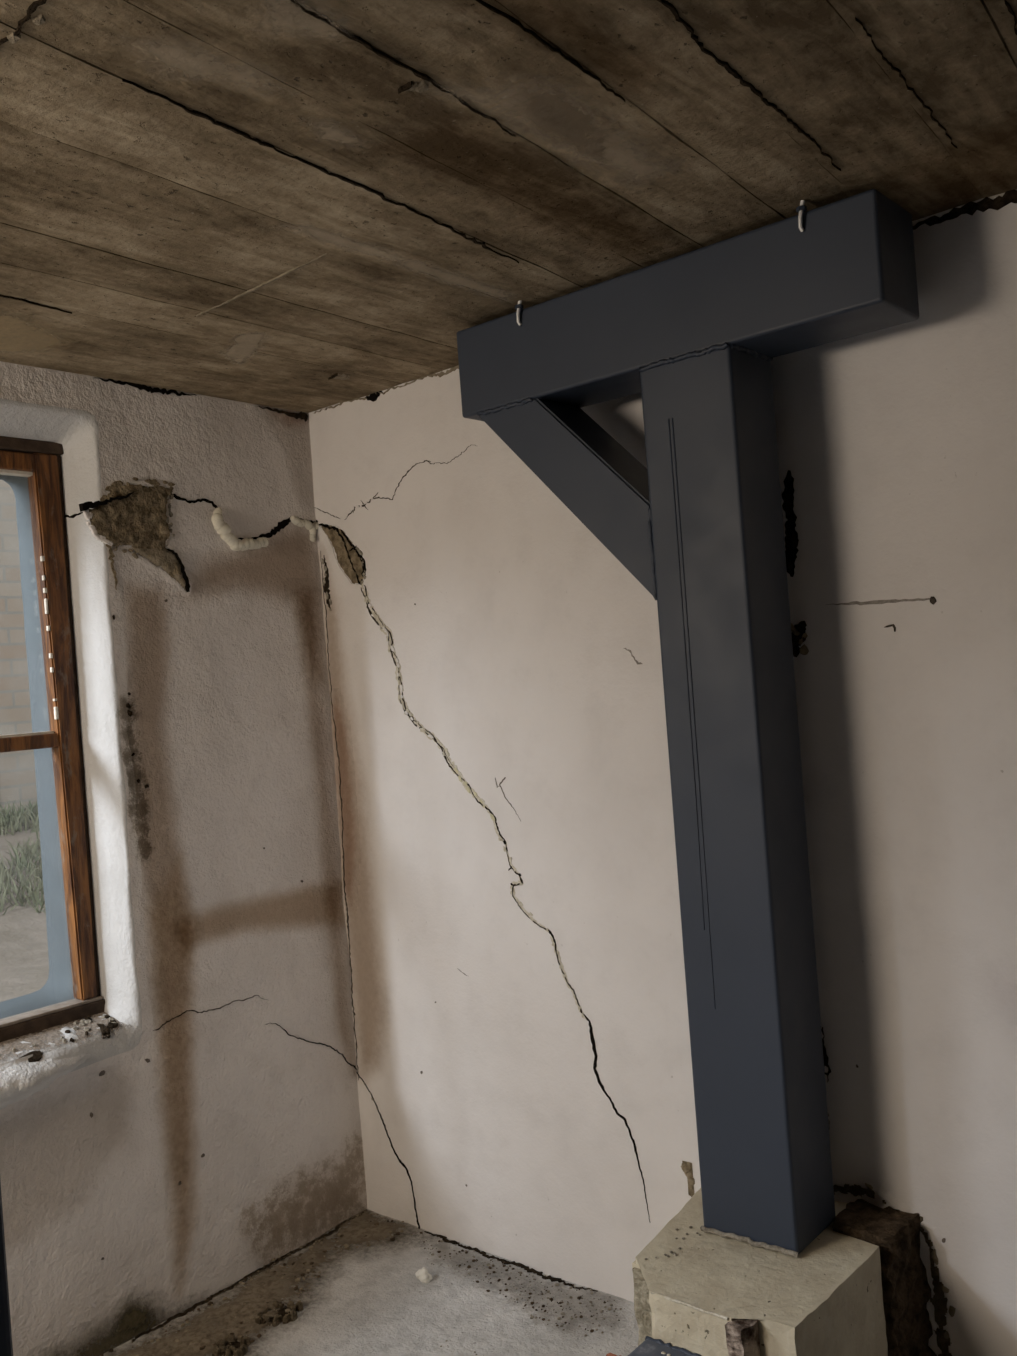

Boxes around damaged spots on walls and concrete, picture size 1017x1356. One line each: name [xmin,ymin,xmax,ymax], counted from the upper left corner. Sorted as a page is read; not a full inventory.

spalling [79,477,193,602]
crack [171,494,218,508]
spalling [316,513,374,611]
crack [238,445,476,540]
spalling [782,470,799,577]
spalling [791,621,809,657]
crack [153,562,598,1292]
crack [360,579,650,1222]
spalling [832,1173,962,1356]
leakage [55,1303,179,1356]